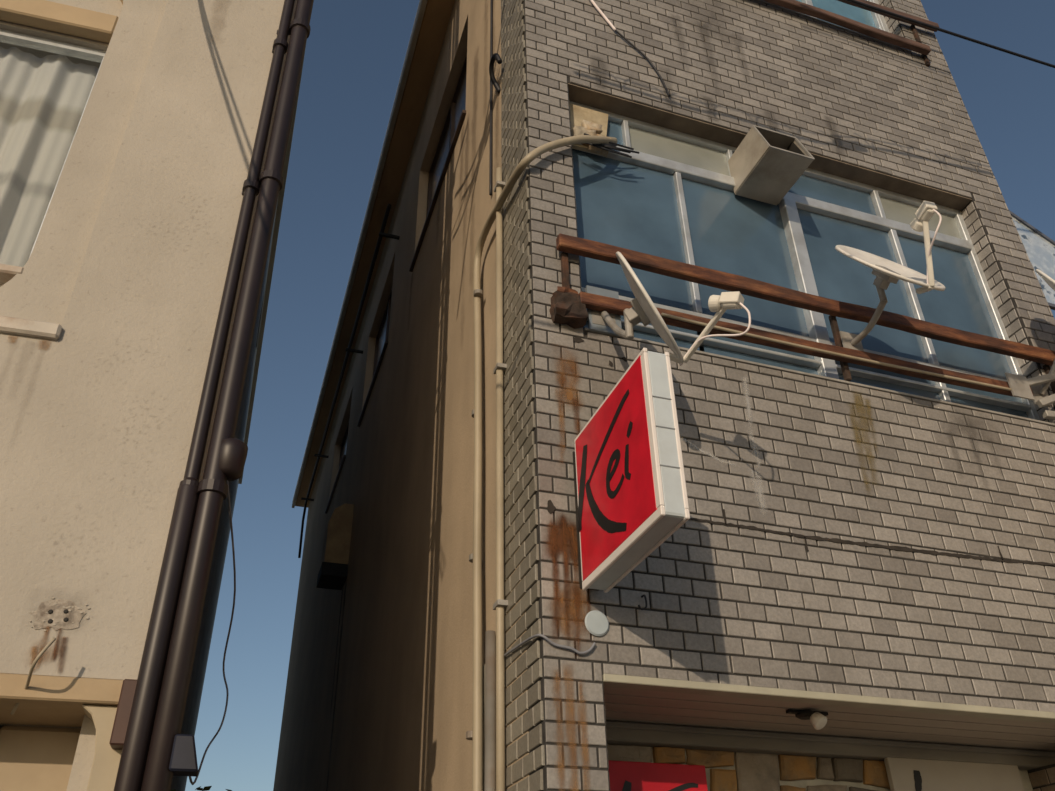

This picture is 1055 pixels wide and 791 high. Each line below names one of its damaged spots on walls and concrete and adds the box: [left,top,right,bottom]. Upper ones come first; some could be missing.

rust [558,360,579,431]
rust [549,516,589,645]
rust [32,627,66,663]